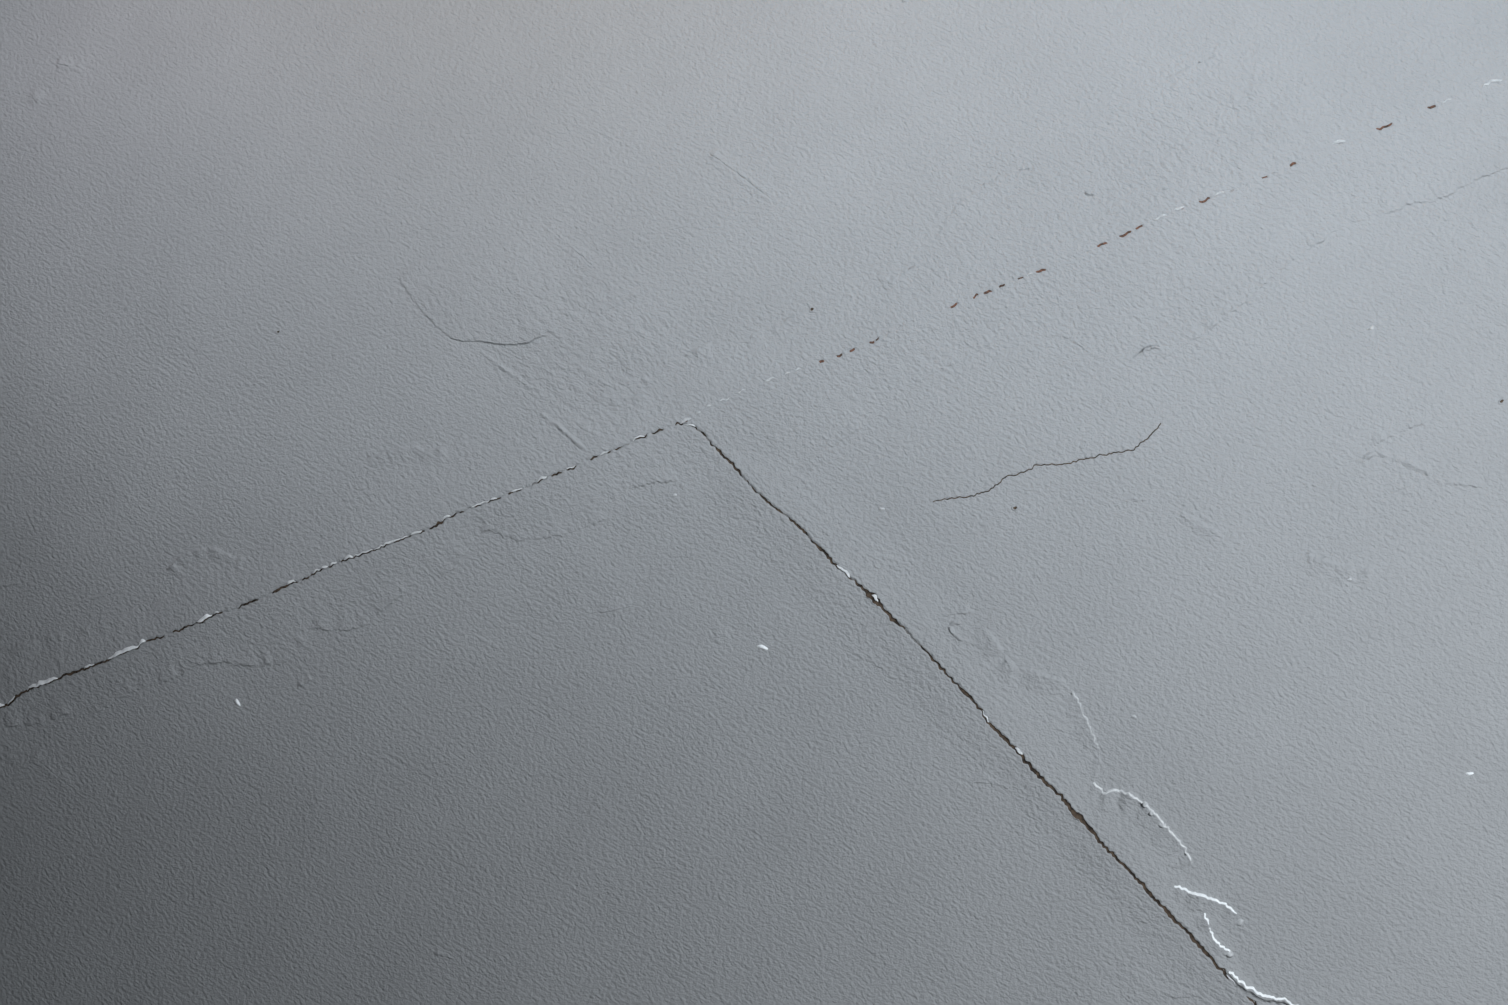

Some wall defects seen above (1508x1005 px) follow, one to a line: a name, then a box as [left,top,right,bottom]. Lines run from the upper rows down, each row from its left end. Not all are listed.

crack [1427,79,1503,109]
crack [1333,123,1392,144]
crack [1097,162,1296,247]
crack [951,269,1046,308]
crack [0,326,1257,1005]